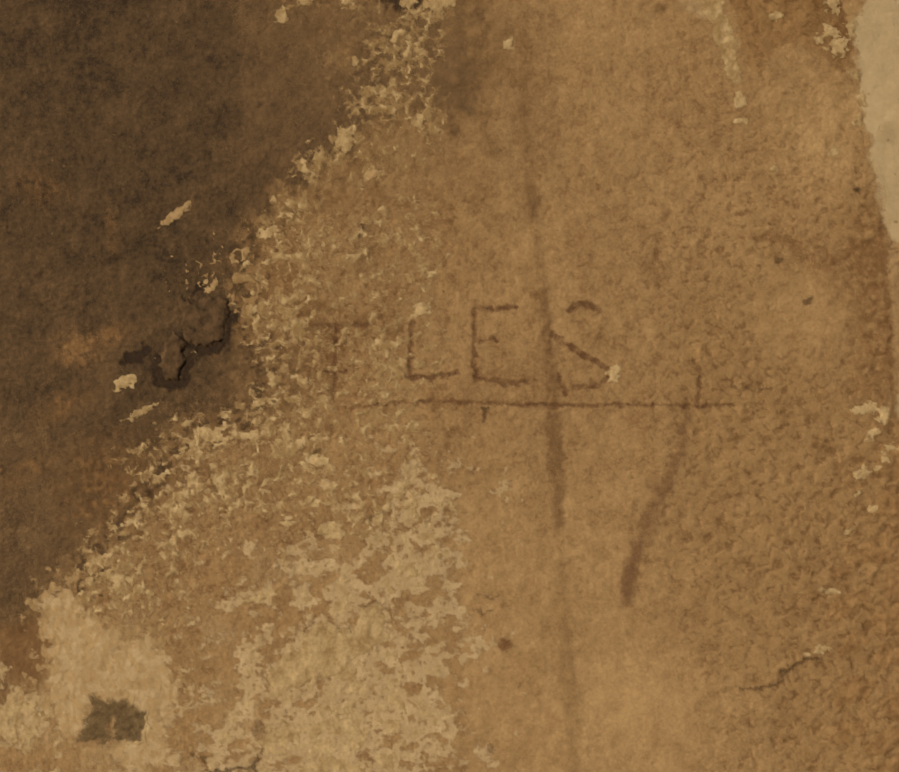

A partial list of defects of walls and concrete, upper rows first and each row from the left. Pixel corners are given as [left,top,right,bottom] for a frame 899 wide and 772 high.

peeling [814,0,858,59]
peeling [0,0,500,772]
damp [0,678,138,772]